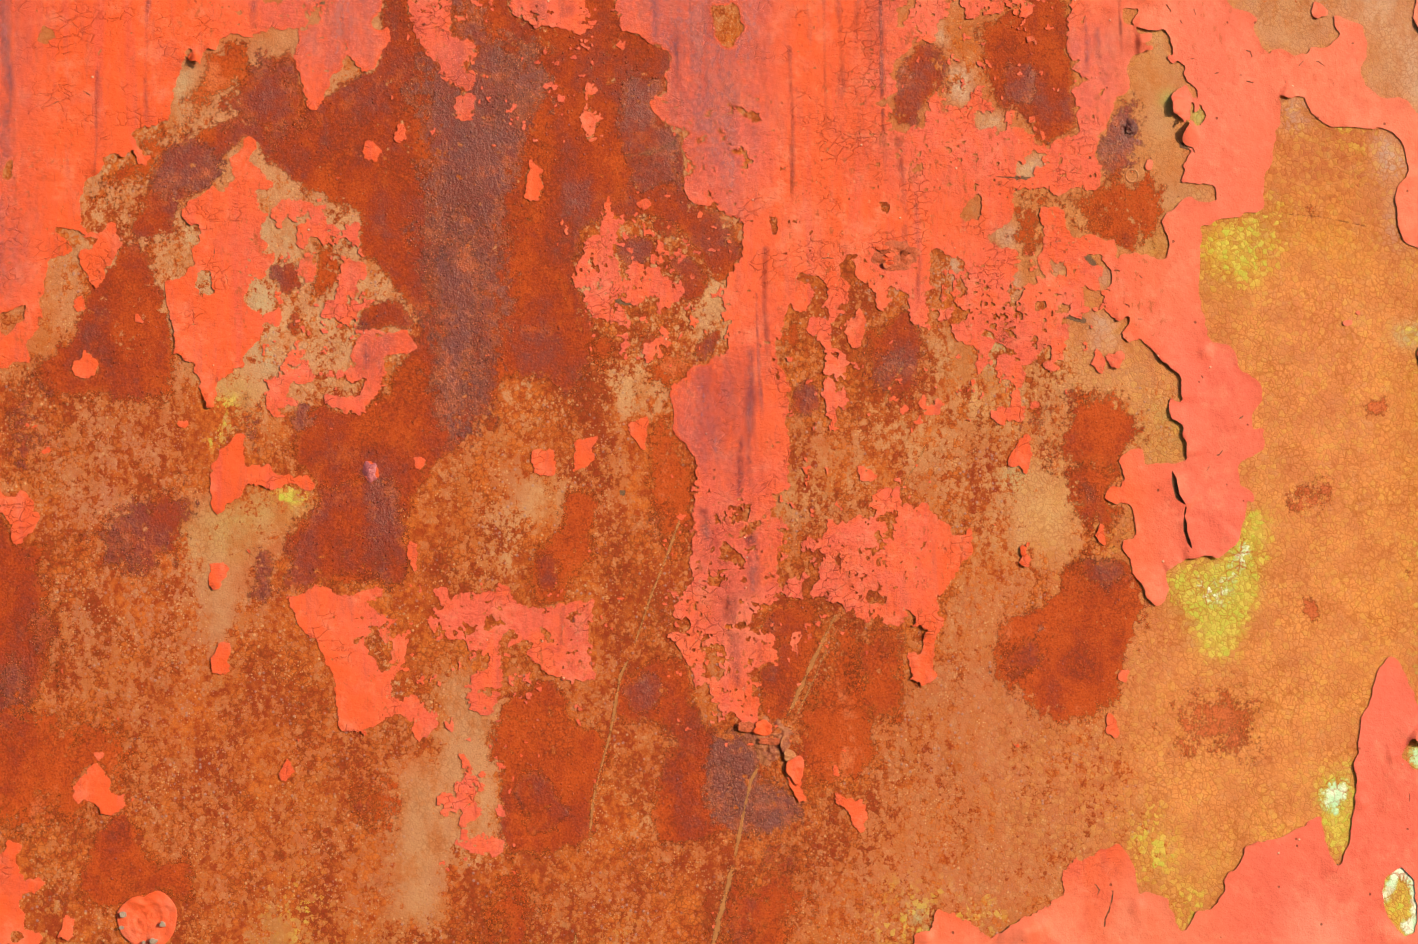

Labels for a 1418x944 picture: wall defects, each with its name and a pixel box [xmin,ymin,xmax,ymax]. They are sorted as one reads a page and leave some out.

peeling [360,0,641,173]
rust [974,0,1078,145]
peeling [1227,0,1418,114]
peeling [517,159,544,222]
peeling [71,350,99,380]
rust [0,0,743,607]
rust [986,387,1149,731]
rust [0,516,197,916]
rust [468,678,613,944]
rust [609,597,921,944]
peeling [1402,739,1418,770]
peeling [1382,868,1417,936]